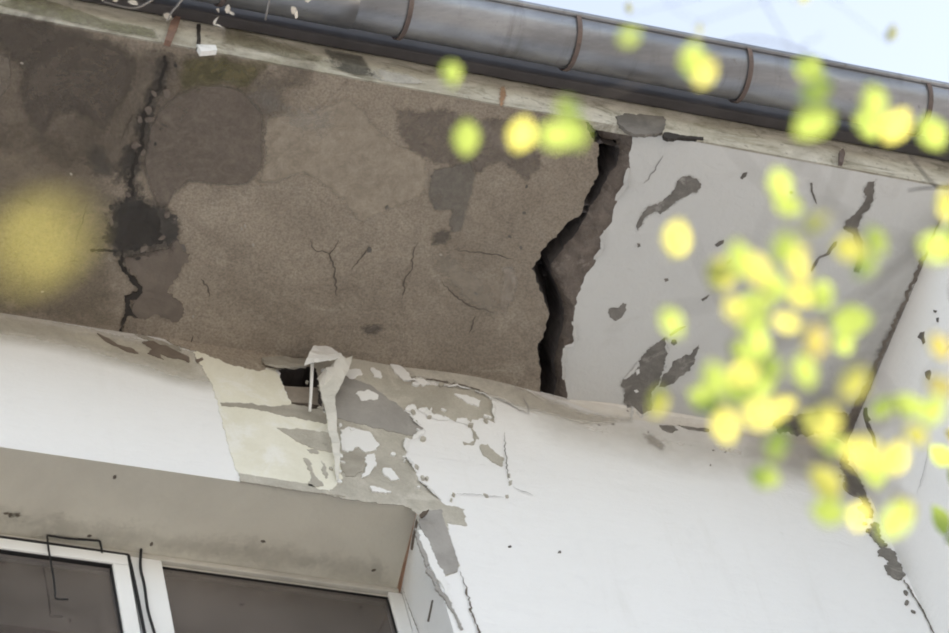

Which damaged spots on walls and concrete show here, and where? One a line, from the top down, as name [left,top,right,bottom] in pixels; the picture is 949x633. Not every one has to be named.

crack [194,24,202,51]
leakage [0,16,540,245]
crack [70,56,179,331]
crack [425,122,704,414]
peeling [608,303,627,321]
peeling [636,176,701,230]
peeling [810,241,837,272]
peeling [843,181,875,242]
peeling [621,334,699,420]
flaking render [97,333,512,604]
crack [834,256,934,633]
crack [403,510,481,633]